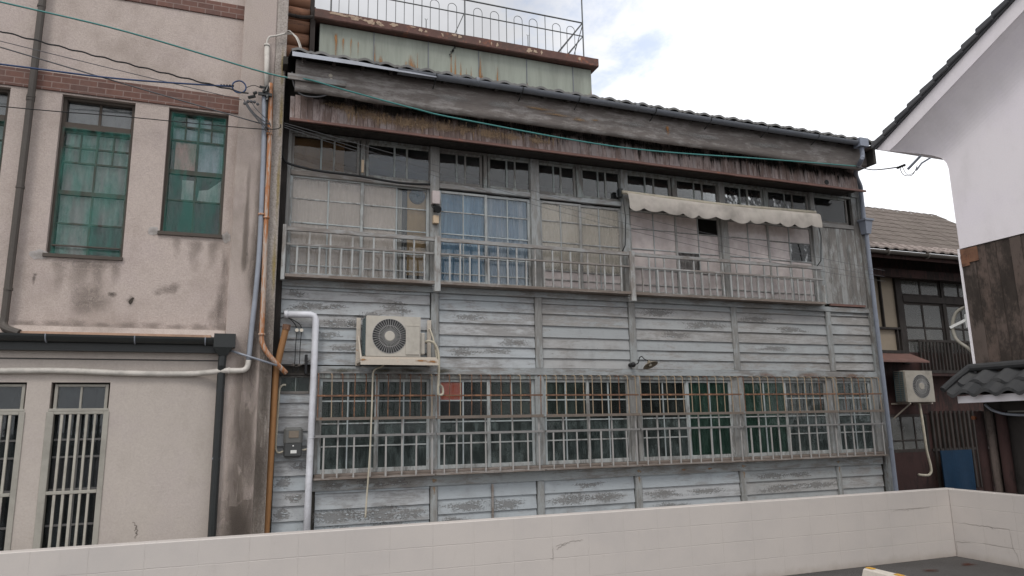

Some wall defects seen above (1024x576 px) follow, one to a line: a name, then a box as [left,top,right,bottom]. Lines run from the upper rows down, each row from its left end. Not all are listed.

damp [322,96,851,180]
damp [228,216,272,535]
rust [317,360,882,417]